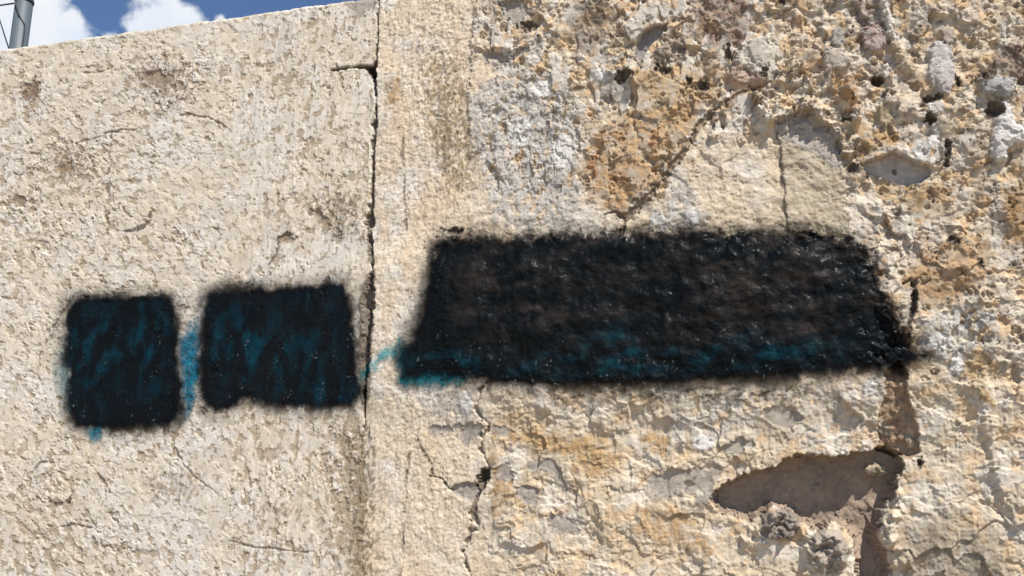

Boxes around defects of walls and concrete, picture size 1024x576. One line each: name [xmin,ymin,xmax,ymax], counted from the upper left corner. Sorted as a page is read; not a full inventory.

crack [332,14,379,405]
crack [605,85,761,232]
crack [404,440,447,503]
crack [462,483,485,571]
spalling [647,369,919,576]